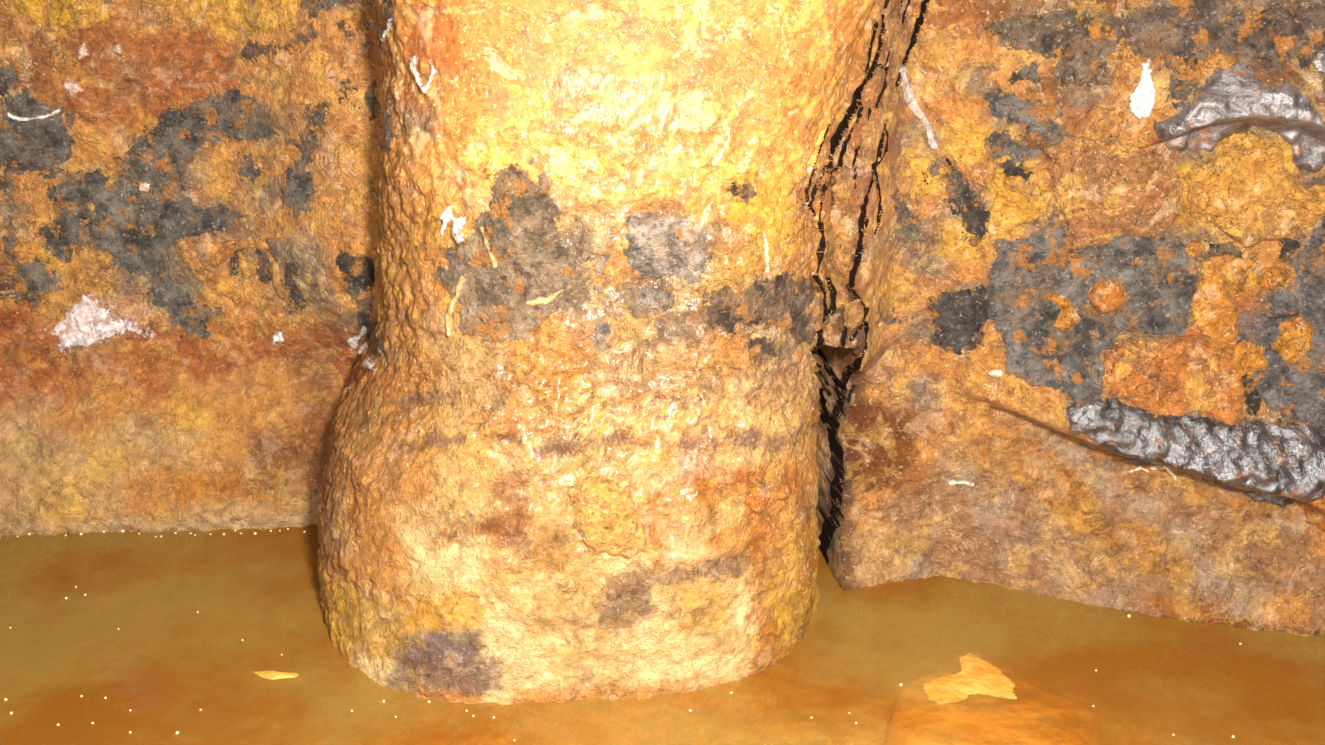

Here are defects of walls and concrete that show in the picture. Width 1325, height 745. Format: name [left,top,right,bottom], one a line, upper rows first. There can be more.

rust [11,0,236,126]
rust [226,0,299,38]
rust [861,77,899,163]
rust [0,318,359,379]
rust [175,232,284,304]
rust [829,170,856,274]
rust [844,299,863,330]
crack [804,0,929,632]
rust [986,133,1325,425]
rust [846,405,912,488]
rust [165,397,503,696]
rust [598,469,817,696]